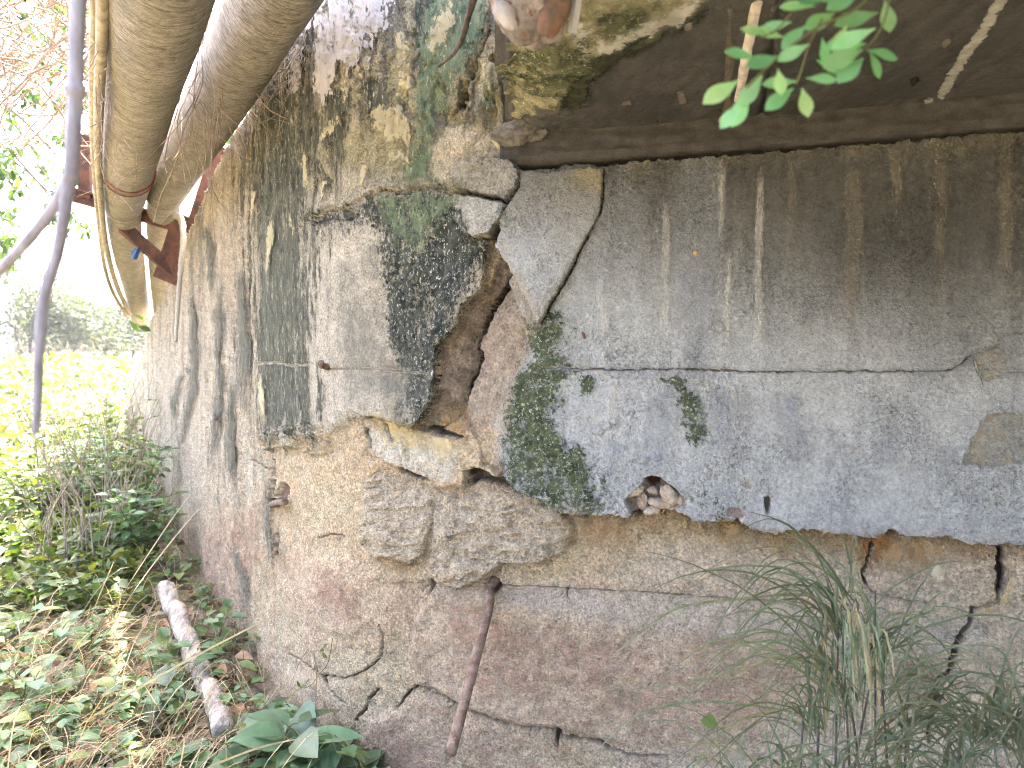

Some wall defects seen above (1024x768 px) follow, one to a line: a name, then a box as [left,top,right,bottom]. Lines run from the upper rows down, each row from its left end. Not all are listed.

peeling [286,0,413,163]
peeling [425,0,456,55]
water stain [481,0,712,120]
water stain [170,298,199,441]
water stain [202,16,490,480]
peeling [363,59,604,495]
crack [468,278,511,397]
water stain [578,375,594,396]
crack [540,345,1024,386]
spalling [625,475,686,516]
crack [289,624,666,758]
crack [926,543,1011,744]